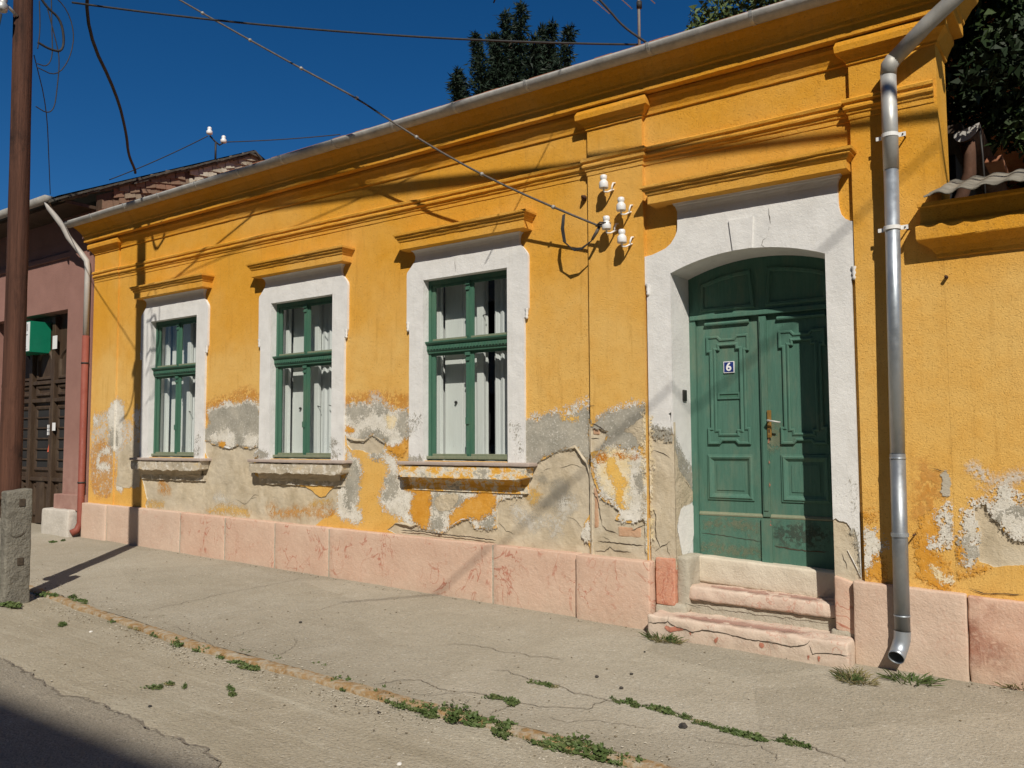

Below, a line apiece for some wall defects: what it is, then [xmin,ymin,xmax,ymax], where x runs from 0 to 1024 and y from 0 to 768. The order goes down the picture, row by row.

flaking render [116,394,762,570]
flaking render [940,470,952,497]
flaking render [973,503,1024,567]
crack [650,600,847,656]